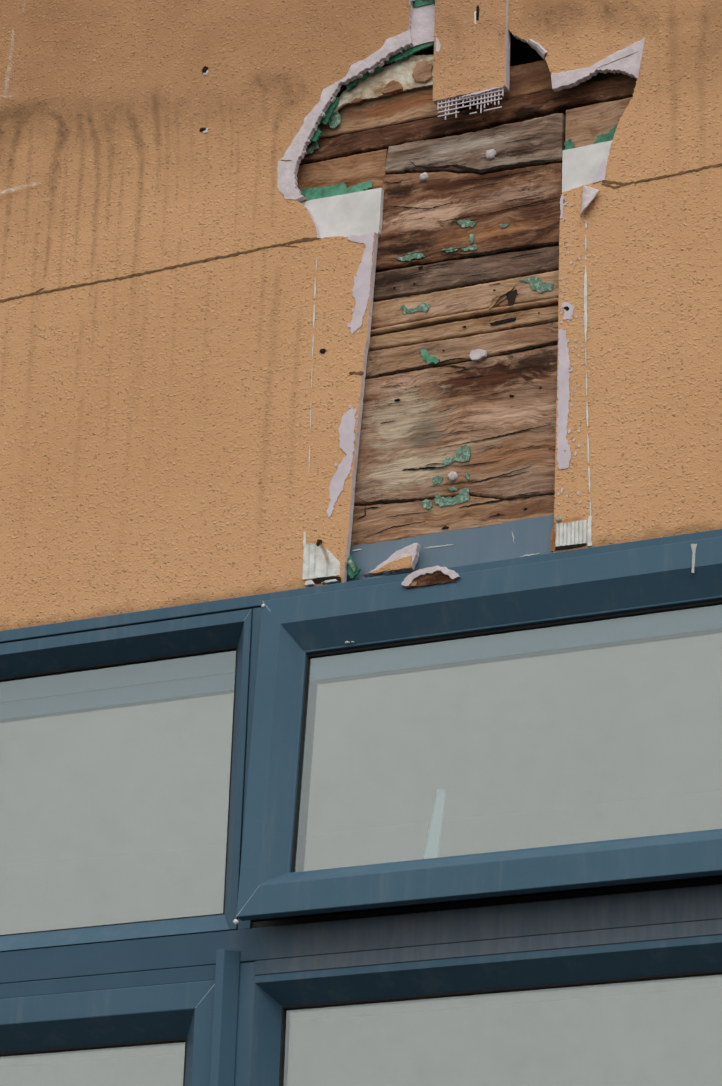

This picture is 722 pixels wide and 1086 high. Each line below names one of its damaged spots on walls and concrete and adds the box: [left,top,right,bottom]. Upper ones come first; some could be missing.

spalling [527,39,548,60]
spalling [551,38,645,92]
spalling [277,0,441,202]
peeling [560,159,606,230]
crack [601,163,722,188]
crack [0,237,321,302]
peeling [347,232,375,335]
peeling [519,277,585,469]
peeling [326,404,357,518]
peeling [422,445,470,509]
spalling [555,482,592,550]
spalling [302,532,341,587]